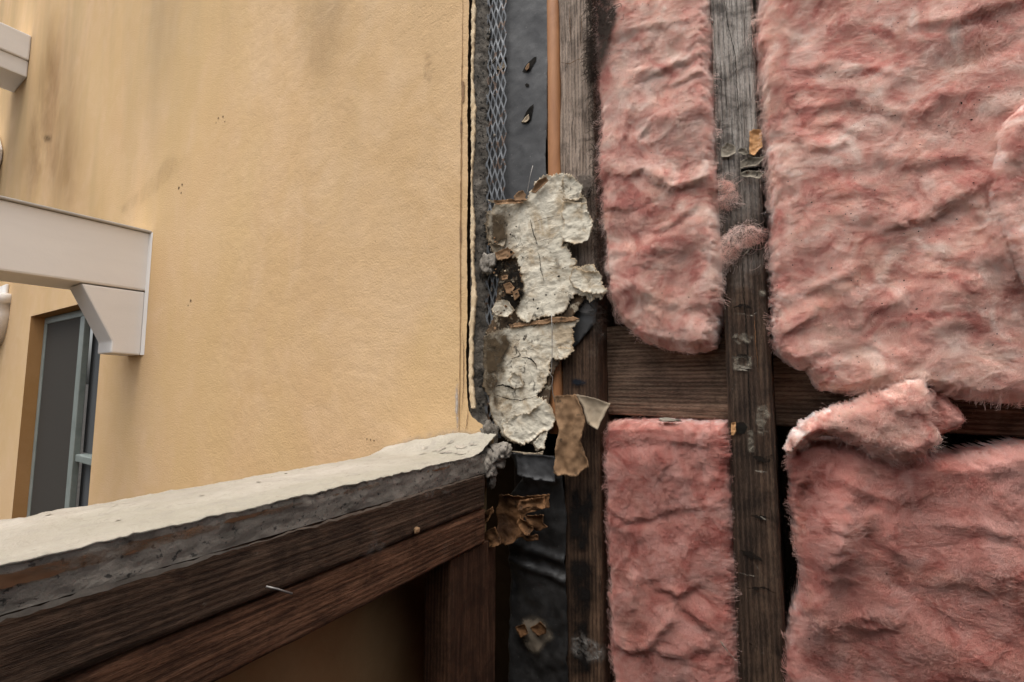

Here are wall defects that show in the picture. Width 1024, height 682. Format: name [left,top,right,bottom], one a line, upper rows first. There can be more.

spalling [721,129,765,179]
spalling [469,0,492,425]
spalling [731,422,747,435]